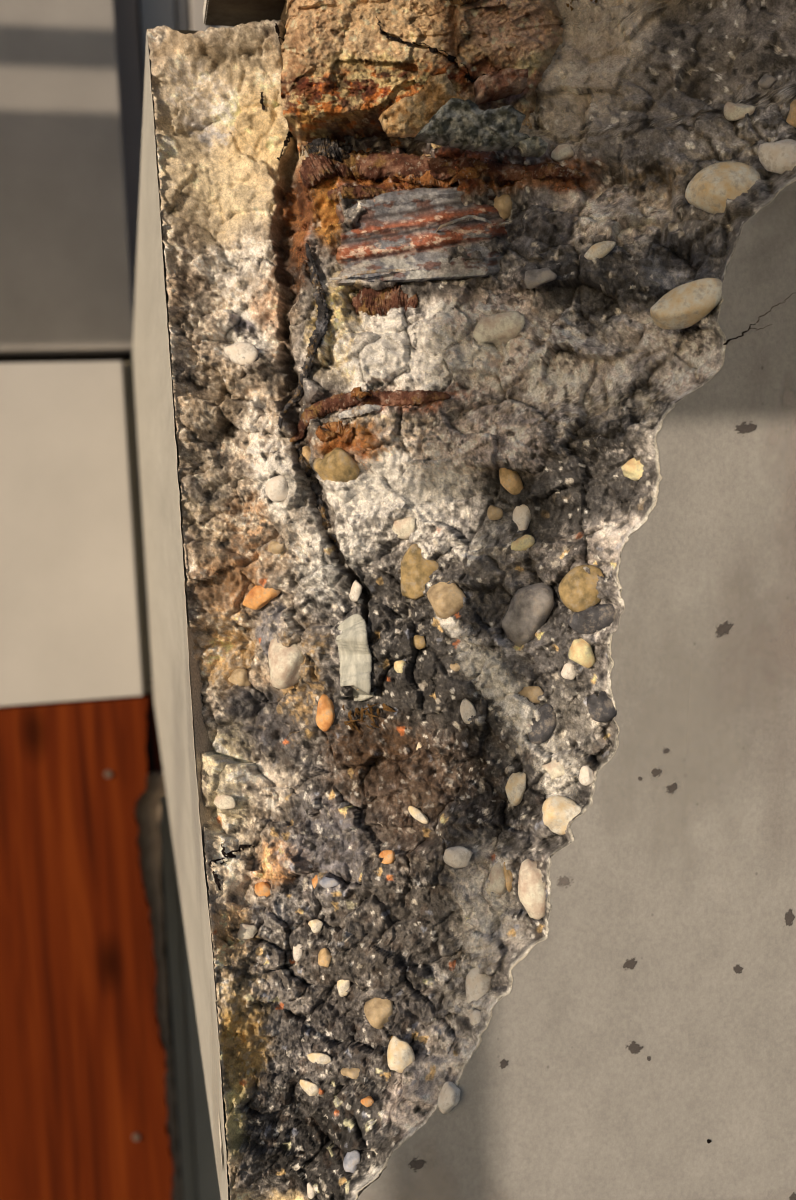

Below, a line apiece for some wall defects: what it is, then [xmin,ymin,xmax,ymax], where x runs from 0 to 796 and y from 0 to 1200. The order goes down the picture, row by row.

crack [376,16,501,82]
spalling [321,176,368,189]
rust [283,136,584,269]
spalling [446,245,484,263]
rust [351,283,418,316]
crack [723,293,793,345]
rust [290,386,451,457]